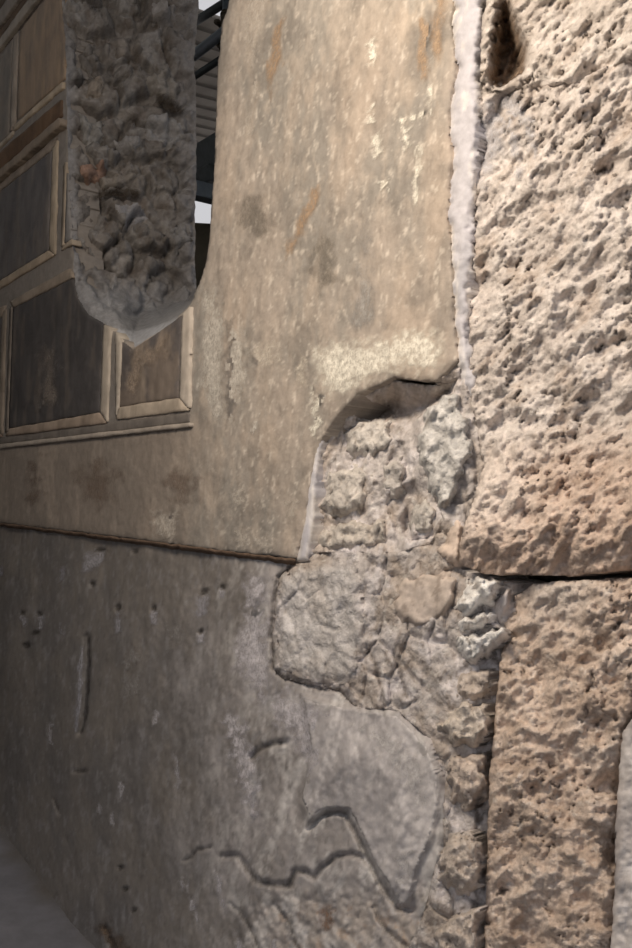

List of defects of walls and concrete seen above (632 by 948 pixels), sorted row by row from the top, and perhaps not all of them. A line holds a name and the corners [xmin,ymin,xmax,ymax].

spalling [156,94,183,114]
water stain [297,332,440,436]
spalling [0,380,473,685]